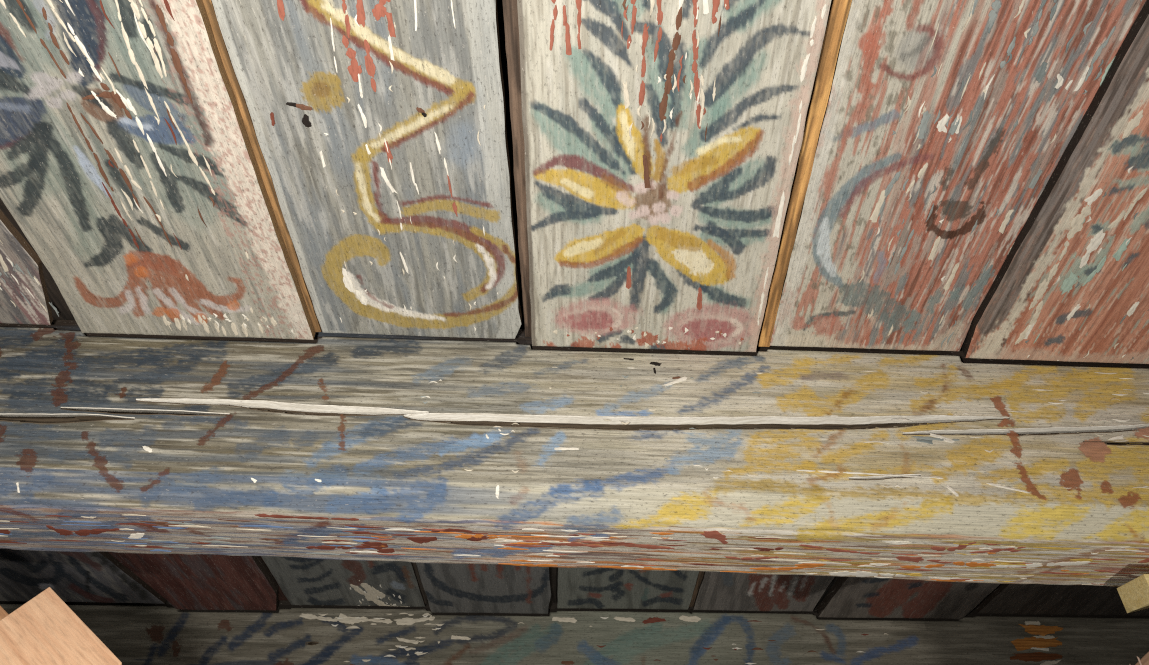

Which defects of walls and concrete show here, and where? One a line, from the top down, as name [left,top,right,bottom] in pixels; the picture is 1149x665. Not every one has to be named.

peeling [800,0,826,82]
peeling [956,0,1058,101]
peeling [1034,26,1116,94]
peeling [788,101,802,165]
peeling [892,96,972,160]
peeling [772,191,785,238]
peeling [869,162,928,274]
peeling [993,208,1014,234]
peeling [757,267,769,326]
peeling [1015,188,1147,358]
crack [0,398,1149,446]
crack [849,473,921,481]